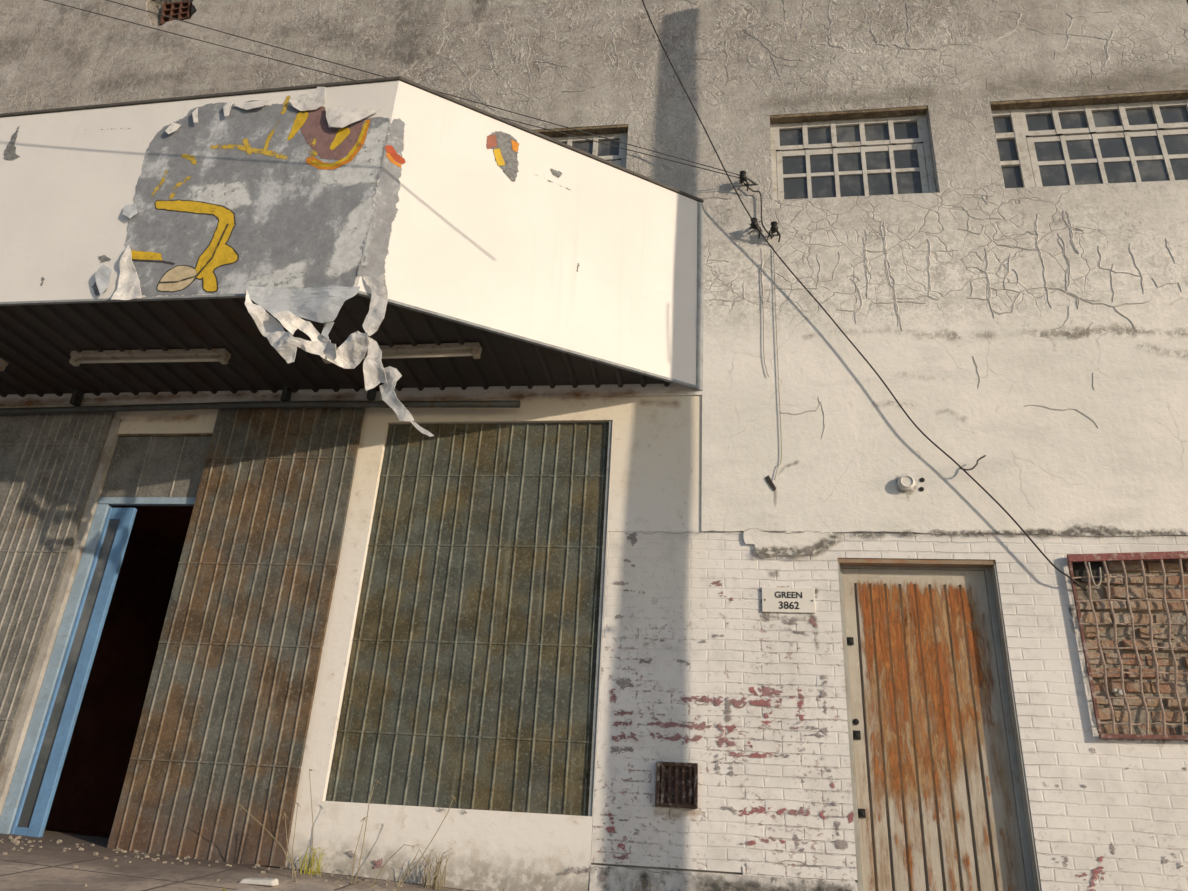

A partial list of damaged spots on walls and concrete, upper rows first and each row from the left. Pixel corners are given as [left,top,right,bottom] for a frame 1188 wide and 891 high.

crack [707,191,1182,338]
crack [972,356,981,388]
crack [779,397,825,439]
crack [1024,374,1098,428]
damp [934,526,1184,537]
peeling [760,590,817,635]
peeling [609,675,855,853]
peeling [606,813,631,863]
damp [697,877,850,891]
peeling [1053,843,1115,891]